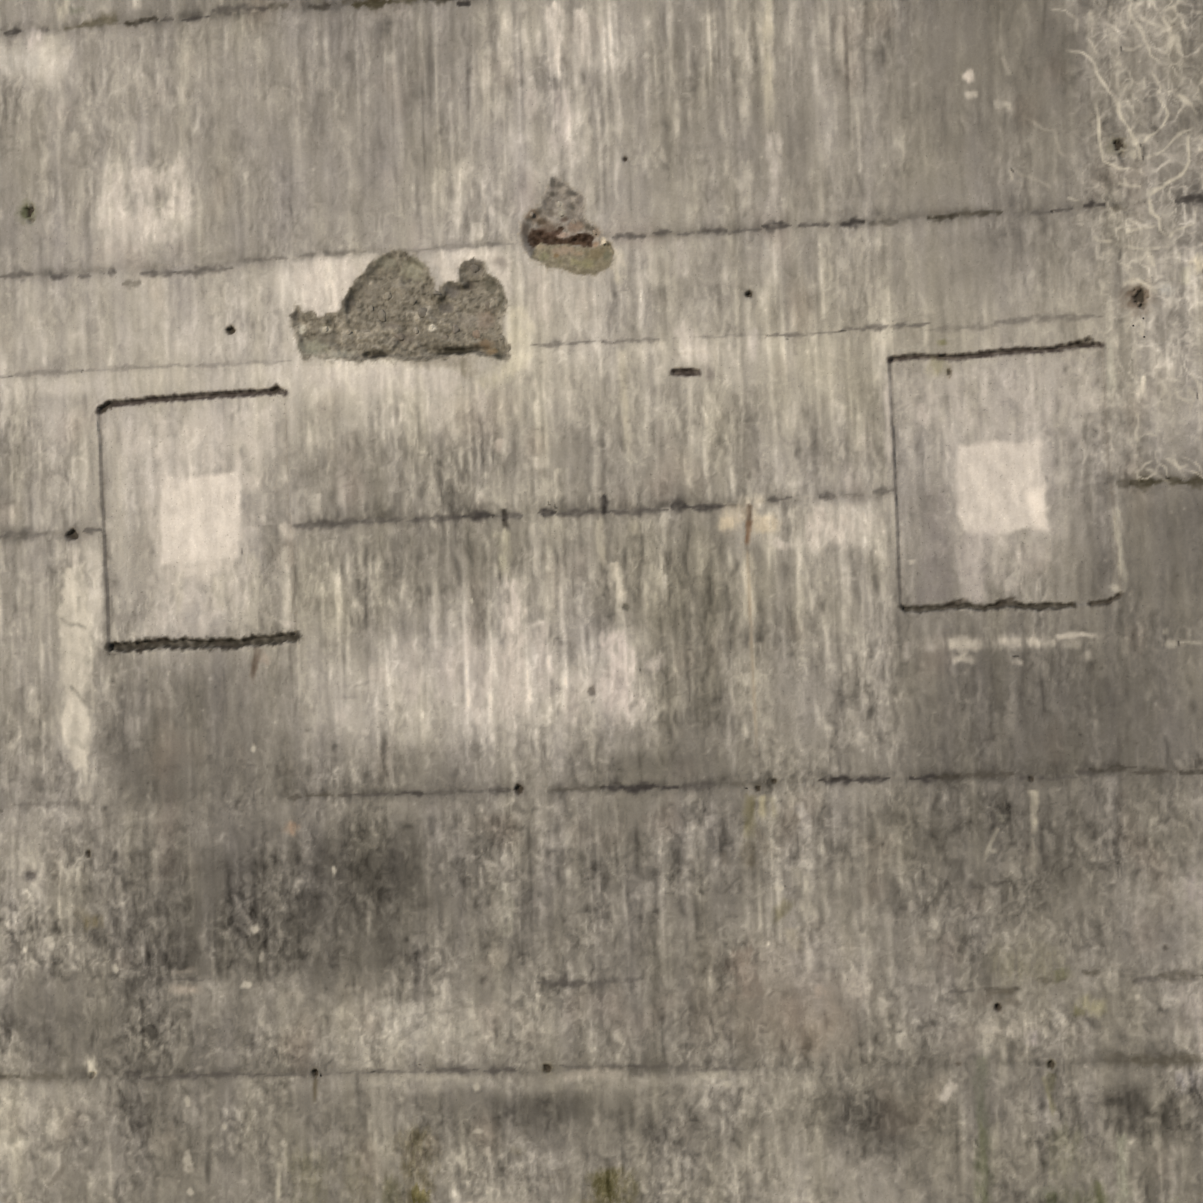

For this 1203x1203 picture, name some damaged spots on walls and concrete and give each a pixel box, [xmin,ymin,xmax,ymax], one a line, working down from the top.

spalling [283,242,513,364]
spalling [514,172,614,282]
efflorescence [1046,0,1203,486]